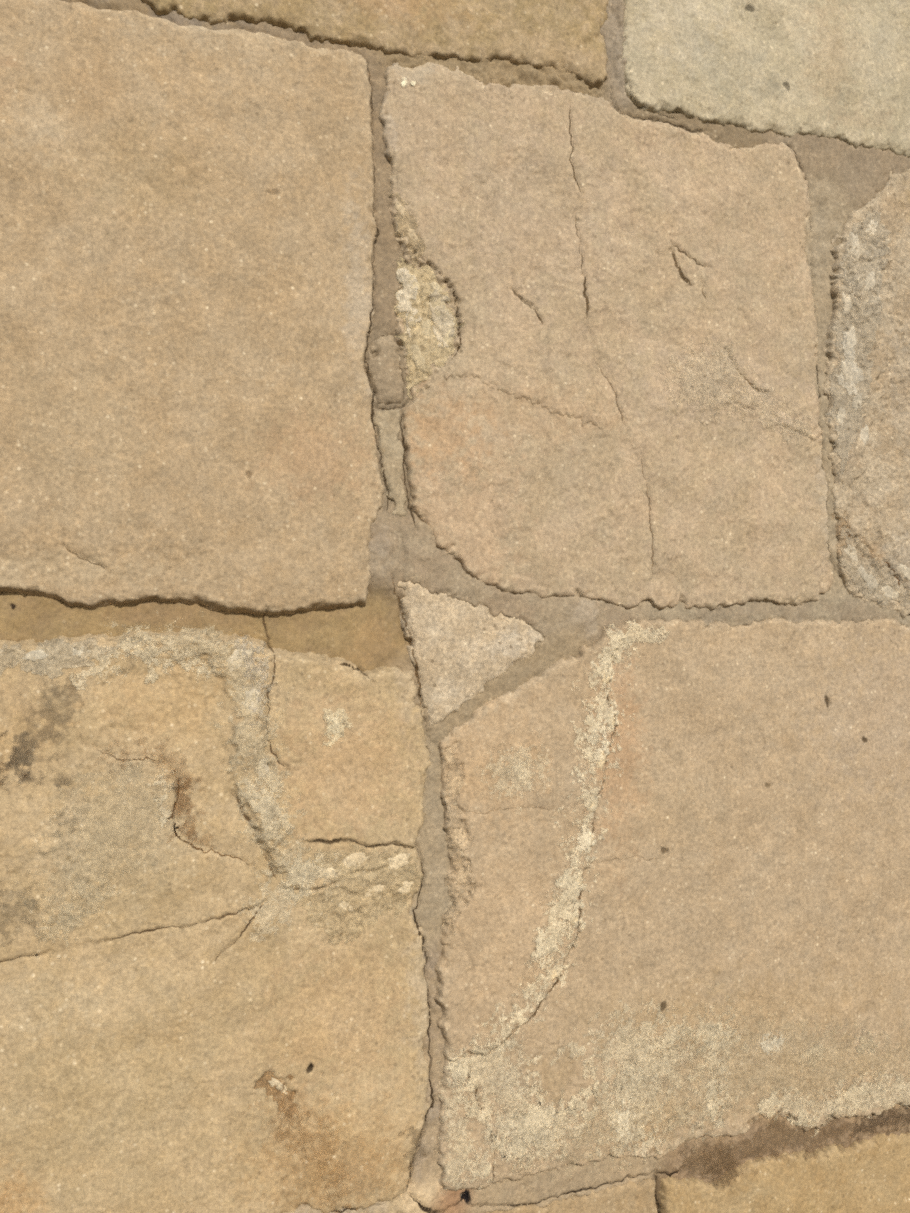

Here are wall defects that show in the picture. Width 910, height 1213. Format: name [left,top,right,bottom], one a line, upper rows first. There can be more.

crack [569,112,581,192]
spalling [388,192,465,399]
crack [575,225,589,314]
crack [112,906,261,957]
crack [312,838,679,1213]
leakage [757,1092,811,1126]
leakage [827,1078,884,1113]